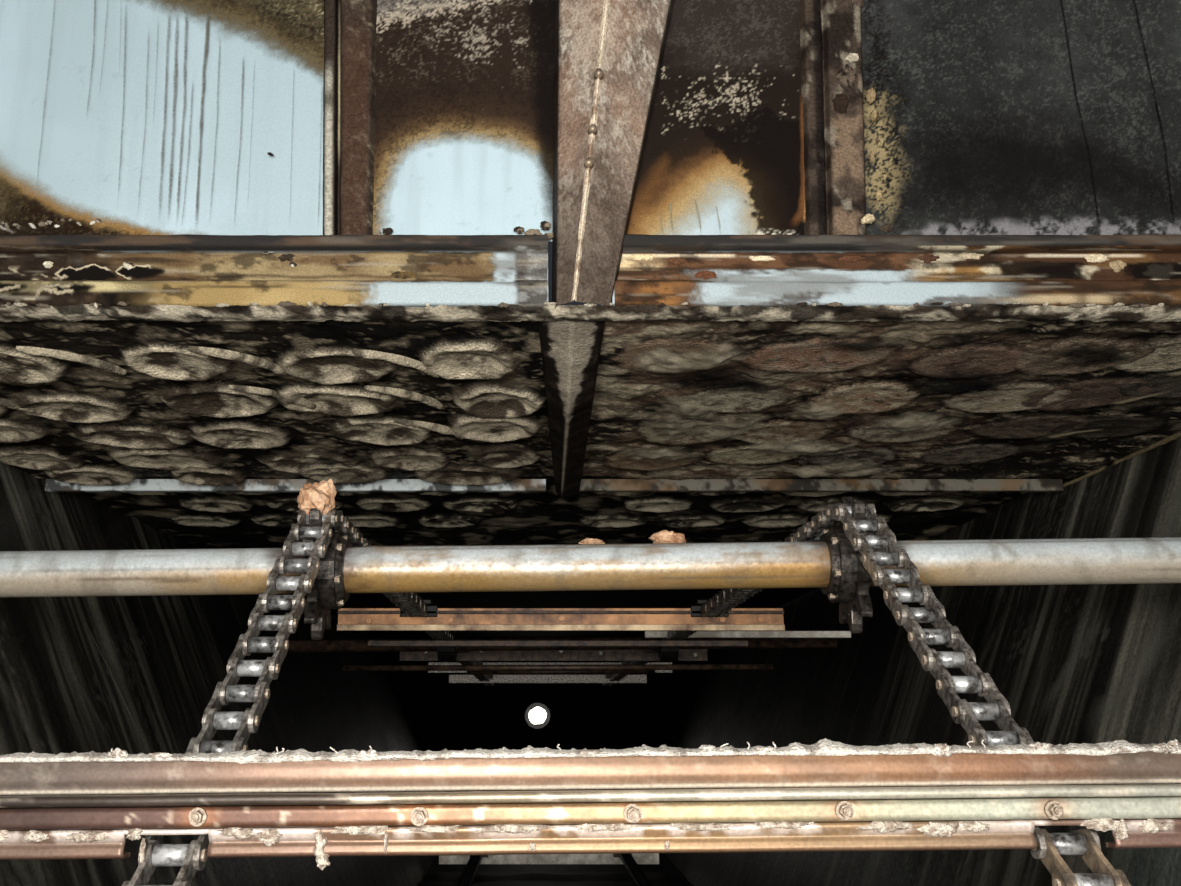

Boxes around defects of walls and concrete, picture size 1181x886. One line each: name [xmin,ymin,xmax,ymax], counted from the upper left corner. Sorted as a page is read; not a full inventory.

leakage [161,18,213,212]
peeling [918,254,940,263]
peeling [1085,254,1127,273]
peeling [695,270,717,279]